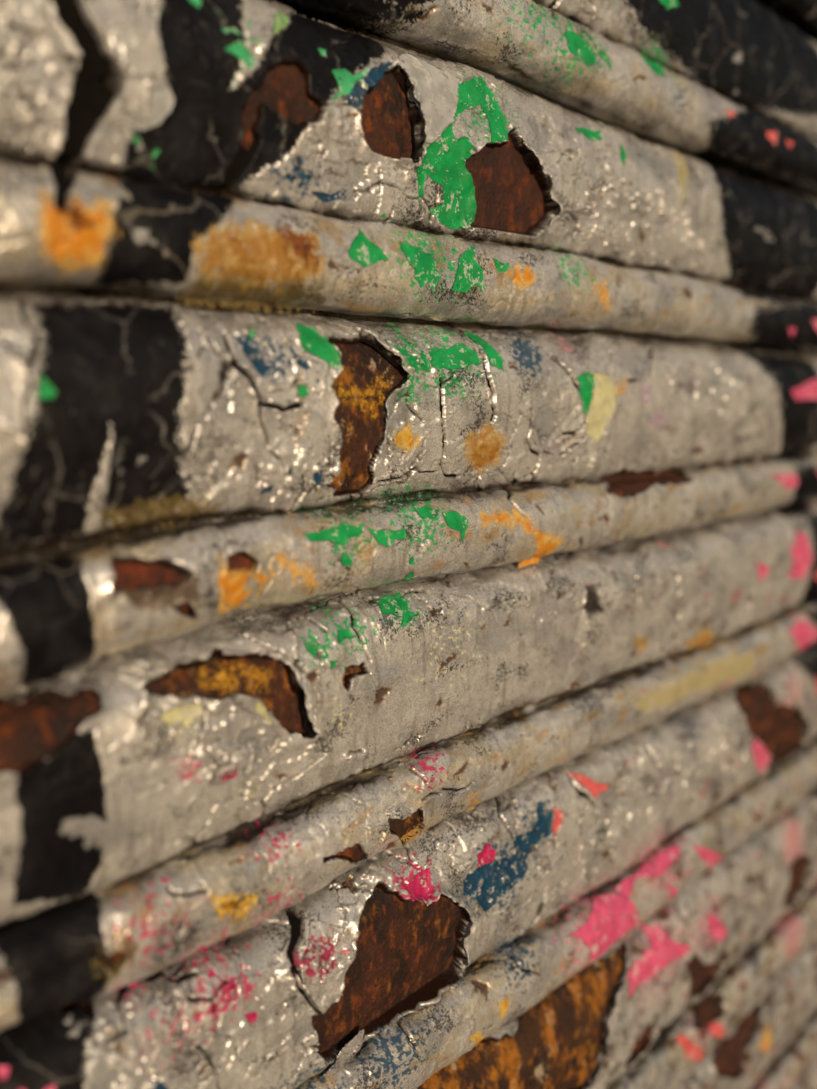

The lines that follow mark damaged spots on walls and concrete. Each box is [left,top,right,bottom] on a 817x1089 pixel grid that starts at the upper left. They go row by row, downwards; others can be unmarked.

rust [361,60,428,170]
peeling [332,53,508,230]
crack [211,341,301,441]
rust [328,332,420,491]
crack [371,376,457,482]
crack [479,351,494,421]
peeling [60,629,317,682]
peeling [464,800,564,912]
crack [104,972,227,1043]
peeling [299,907,354,1014]
rust [312,886,474,1053]
rust [417,940,630,1089]